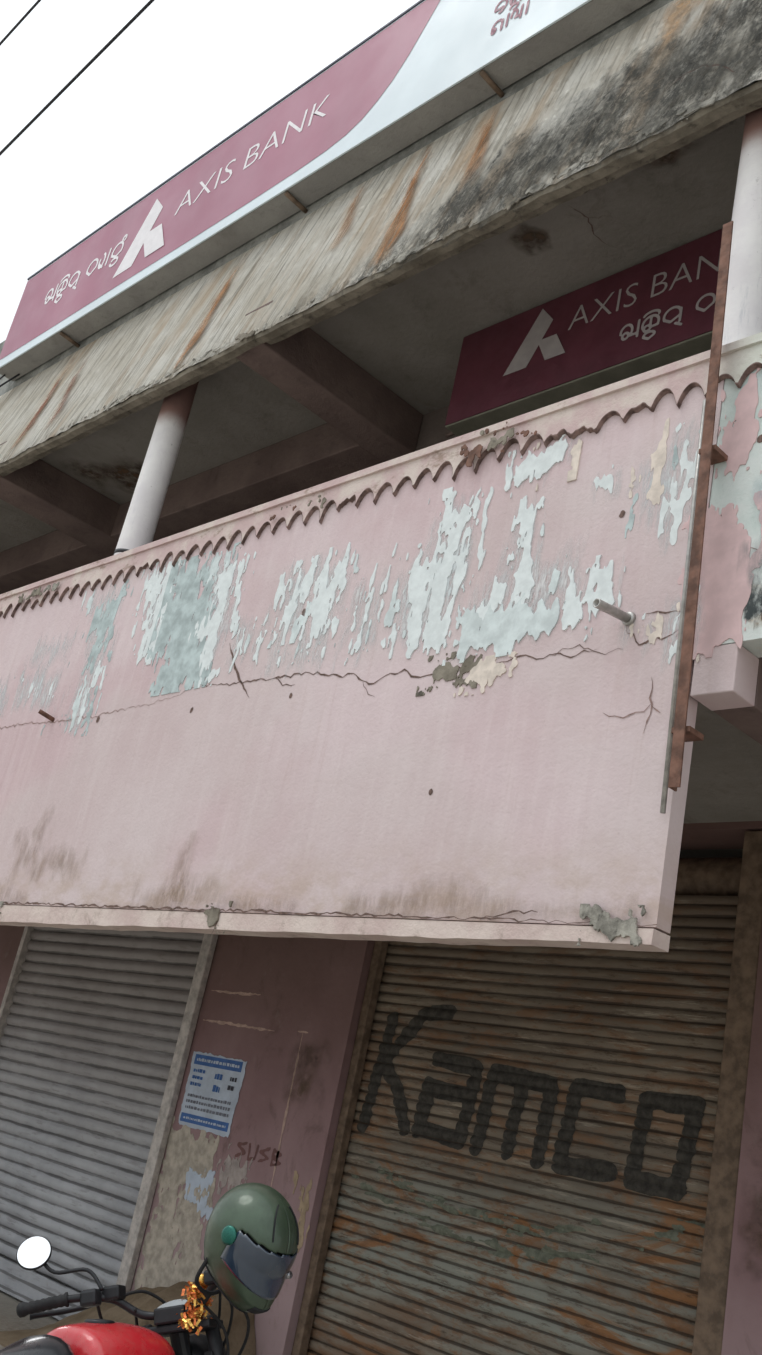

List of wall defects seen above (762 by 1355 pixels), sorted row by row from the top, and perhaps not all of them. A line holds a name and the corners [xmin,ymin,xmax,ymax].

leakage [414,0,762,254]
corrosion [377,153,428,262]
corrosion [175,272,235,368]
corrosion [16,376,75,443]
peeling [718,368,762,481]
peeling [16,422,626,736]
leakage [0,362,762,620]
peeling [594,418,762,665]
crack [0,647,461,729]
crack [498,611,680,663]
crack [604,678,660,733]
spalling [577,904,646,947]